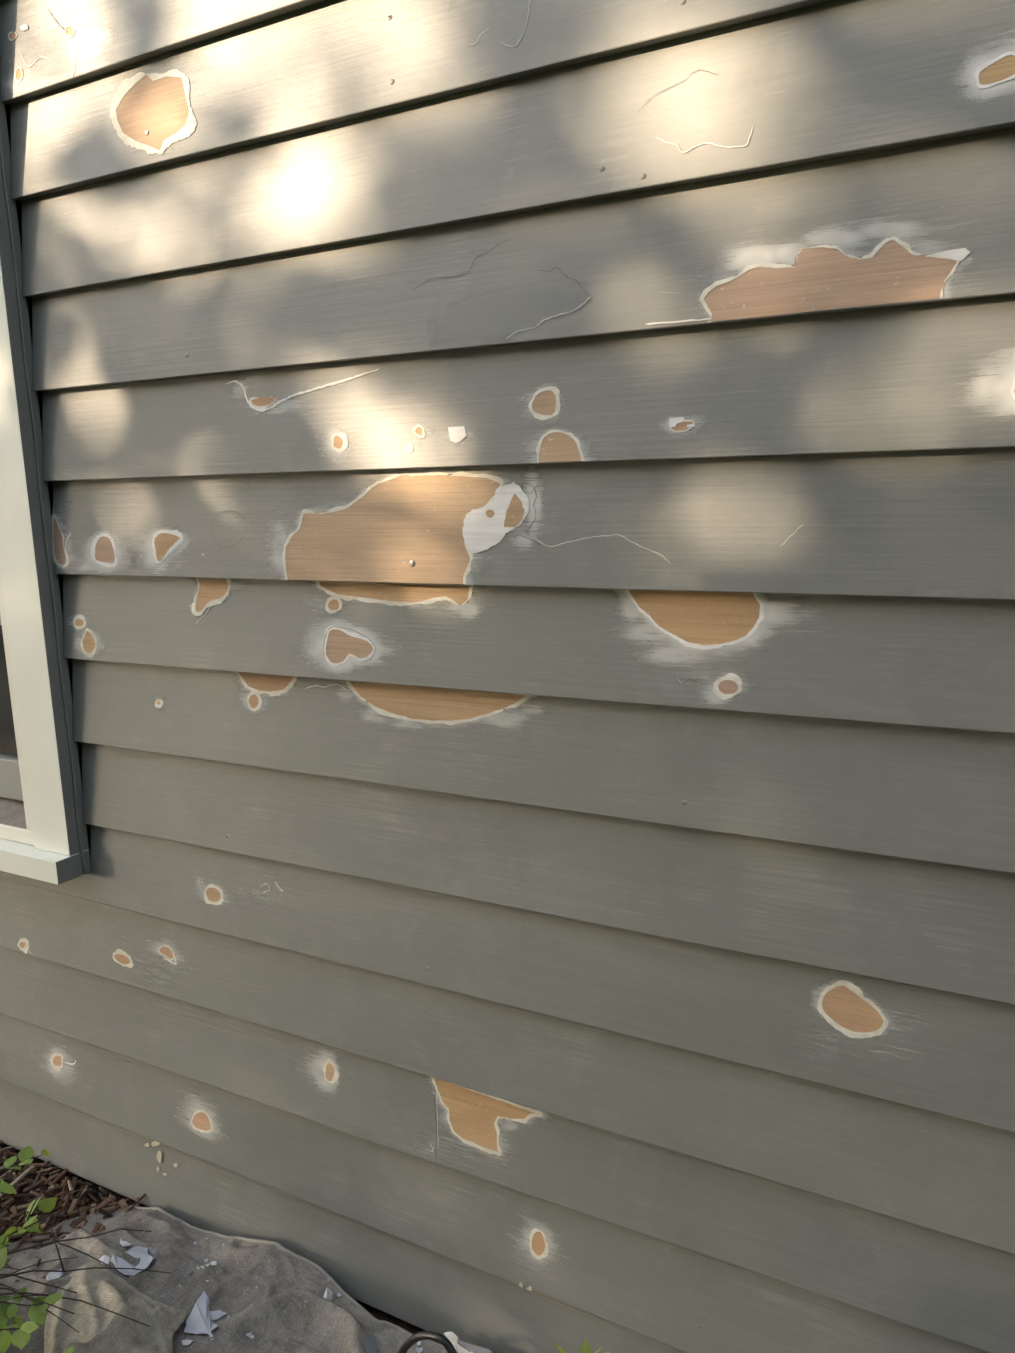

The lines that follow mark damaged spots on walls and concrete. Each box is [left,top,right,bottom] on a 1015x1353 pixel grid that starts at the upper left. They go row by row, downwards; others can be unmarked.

peeling [110,56,198,154]
crack [639,70,753,153]
peeling [960,38,1015,101]
crack [506,267,590,339]
peeling [645,220,970,325]
peeling [967,350,1015,418]
peeling [52,505,190,574]
peeling [232,386,593,728]
peeling [190,578,245,623]
peeling [613,589,798,705]
peeling [811,980,893,1039]
peeling [425,1076,549,1158]